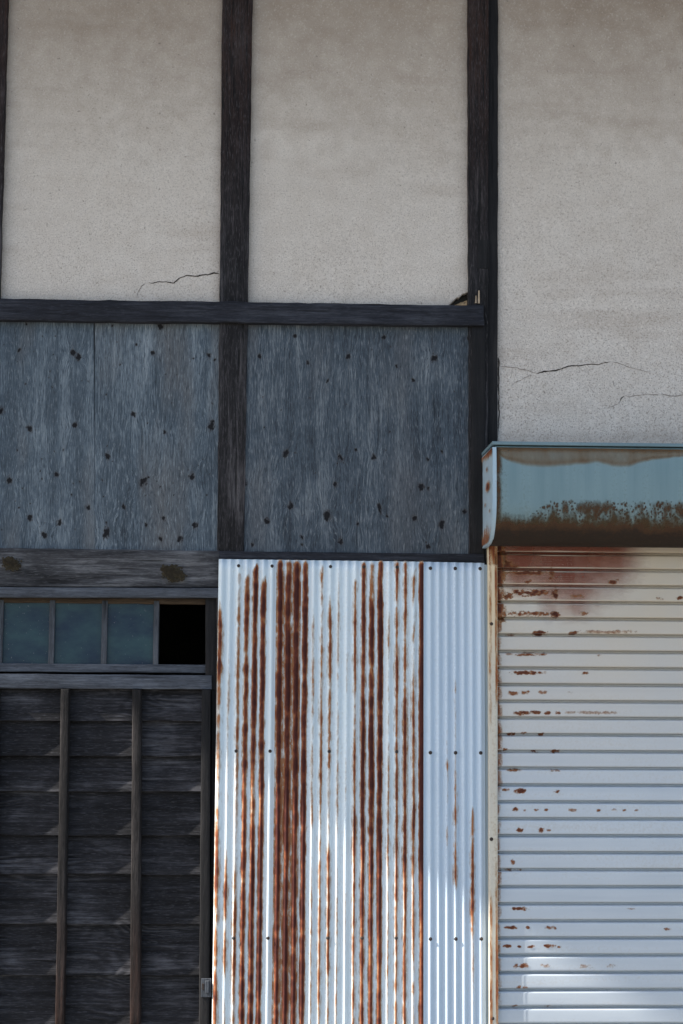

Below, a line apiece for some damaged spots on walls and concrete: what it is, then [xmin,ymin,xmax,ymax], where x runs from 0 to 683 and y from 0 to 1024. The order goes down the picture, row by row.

crack [137,272,219,295]
crack [498,358,681,433]
corrosion [482,500,683,794]
corrosion [213,560,339,1024]
corrosion [351,560,424,1024]
corrosion [446,762,458,886]
corrosion [489,828,560,1024]